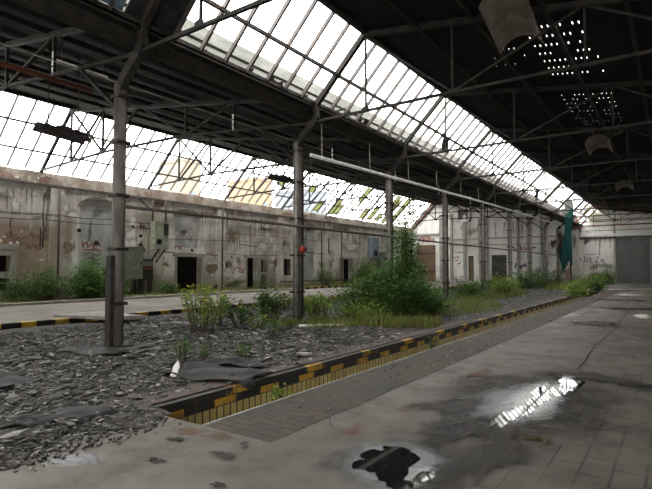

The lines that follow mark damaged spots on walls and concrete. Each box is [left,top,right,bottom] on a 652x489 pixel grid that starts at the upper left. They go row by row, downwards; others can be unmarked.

crack [577,299,646,369]
water stain [548,371,652,391]
water stain [417,397,526,477]